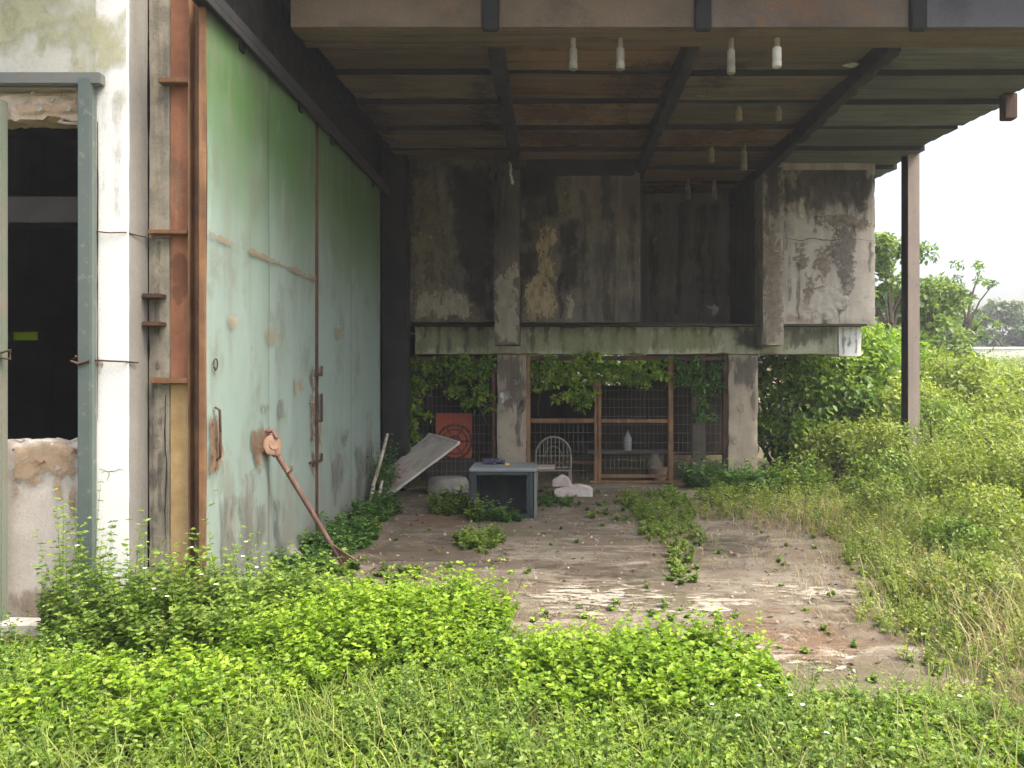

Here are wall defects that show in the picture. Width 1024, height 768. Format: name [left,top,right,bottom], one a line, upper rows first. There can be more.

leakage [765,167,875,219]
leakage [446,164,495,319]
leakage [508,162,580,318]
spalling [494,196,575,344]
spalling [12,441,78,484]
corrosion [209,417,223,473]
corrosion [252,425,270,470]